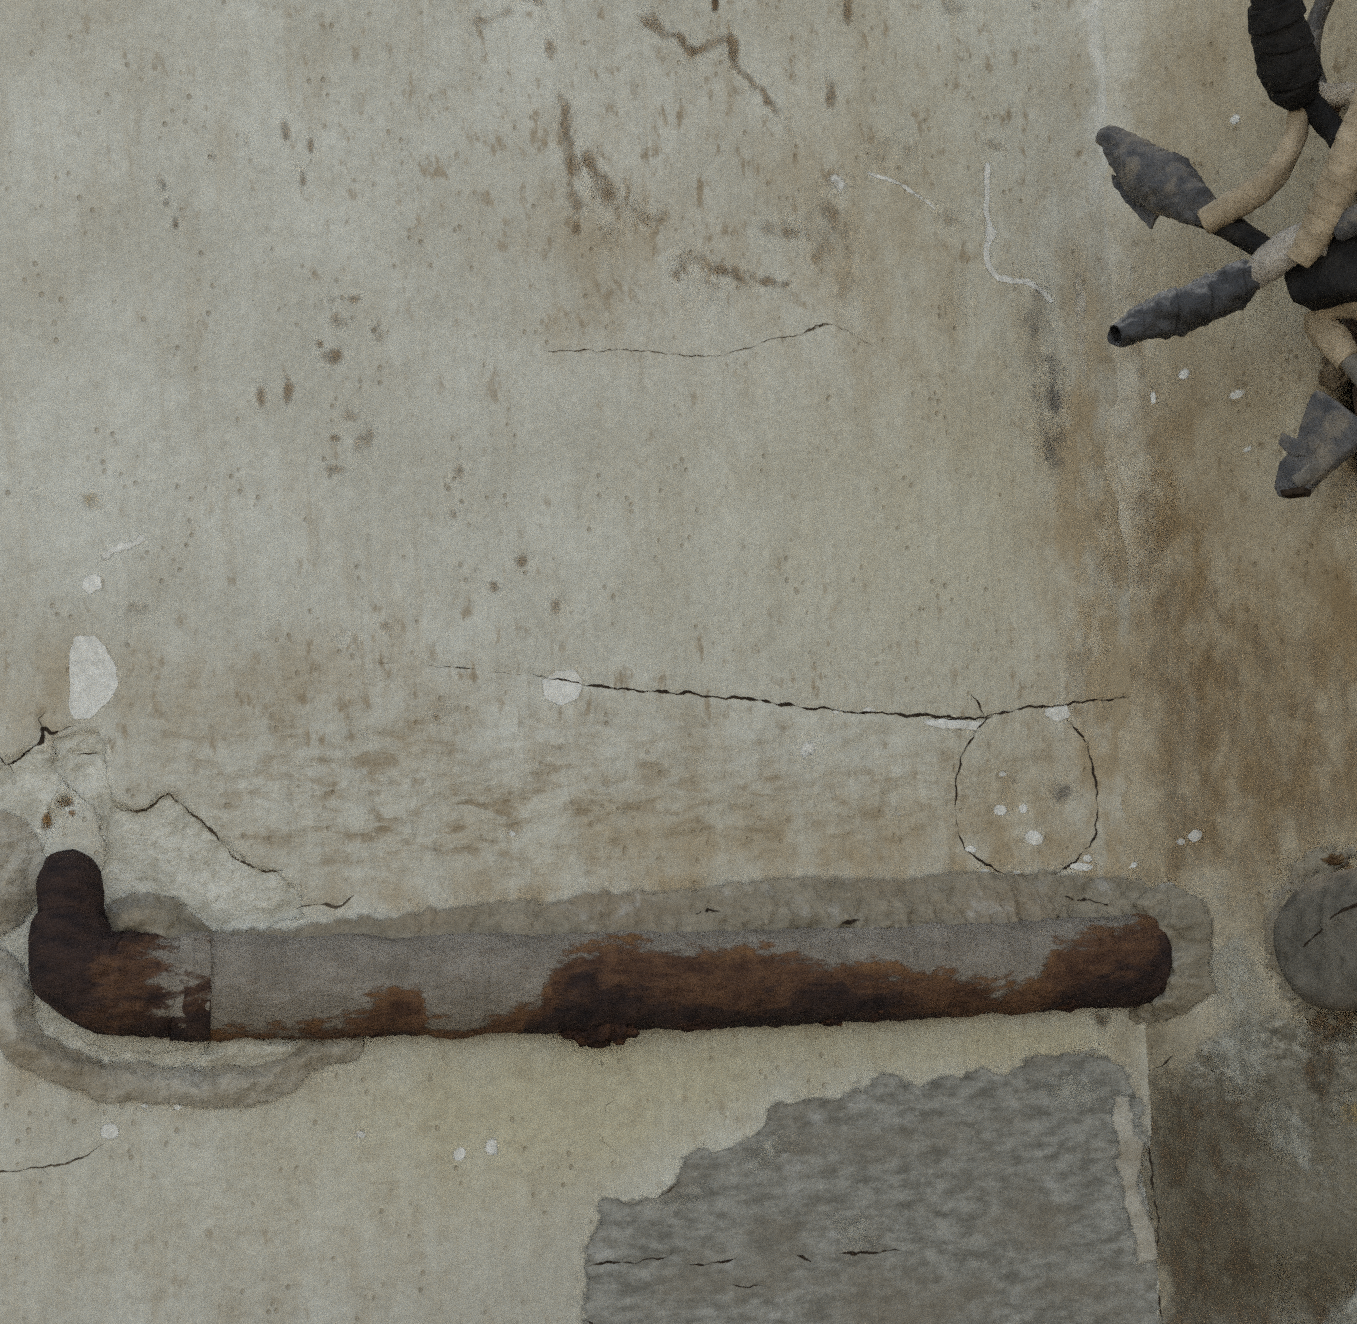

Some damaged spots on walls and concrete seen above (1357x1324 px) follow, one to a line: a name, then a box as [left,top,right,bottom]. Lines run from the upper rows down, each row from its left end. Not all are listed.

crack [545,323,871,357]
peeling [82,575,102,594]
spalling [0,635,303,933]
crack [431,665,1131,917]
corrosion [1321,853,1353,869]
crack [842,917,860,925]
spalling [0,902,214,1071]
peeling [100,1123,118,1139]
peeling [583,1049,1160,1324]